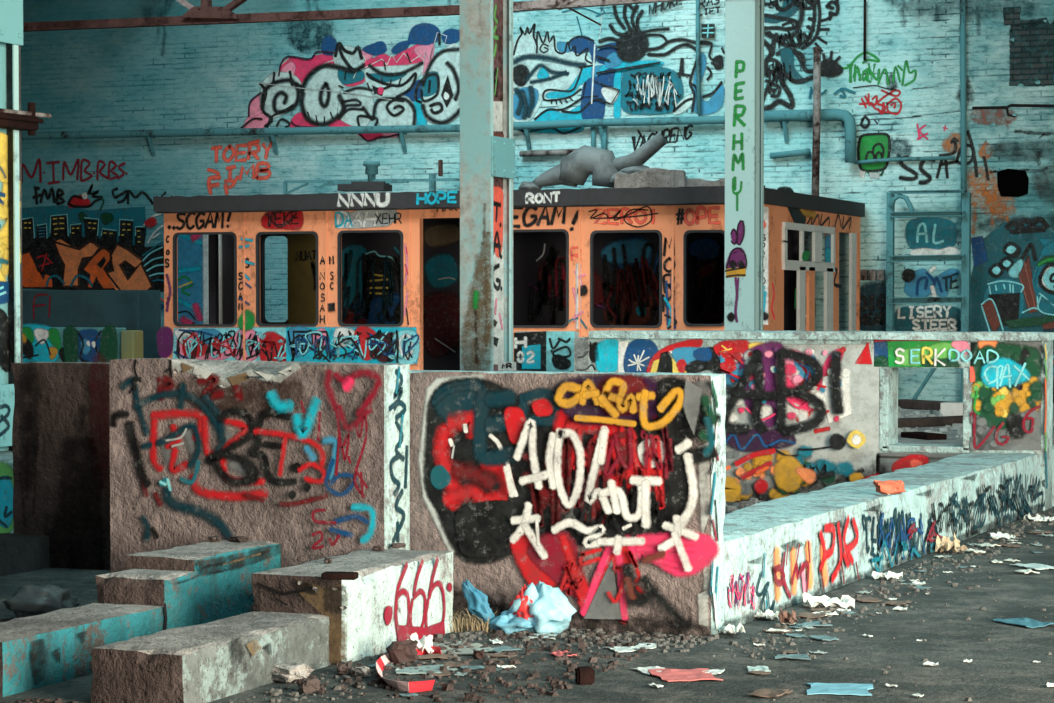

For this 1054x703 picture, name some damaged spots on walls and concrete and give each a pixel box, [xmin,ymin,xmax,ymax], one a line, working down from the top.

flaking render [1003,7,1054,87]
water stain [992,144,1050,194]
corrosion [461,204,495,371]